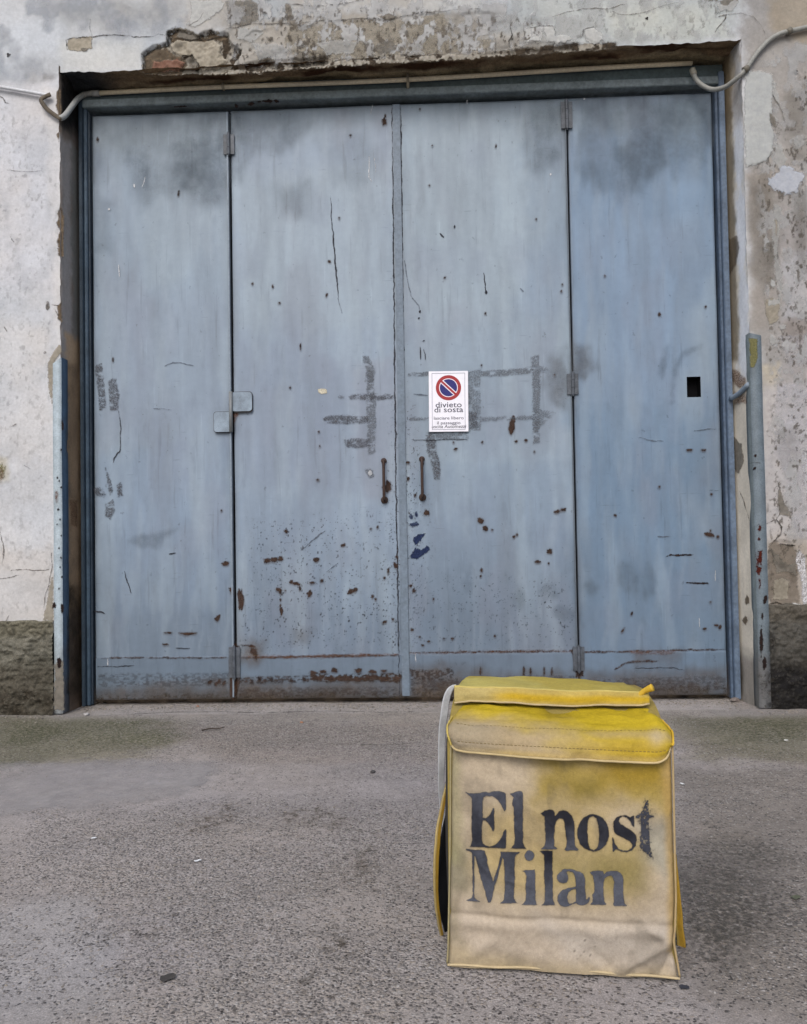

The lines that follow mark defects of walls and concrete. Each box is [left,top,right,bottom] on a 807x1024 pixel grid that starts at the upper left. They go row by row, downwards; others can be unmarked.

peeling [142,0,617,76]
peeling [762,185,807,250]
peeling [749,248,807,371]
corrosion [755,525,770,694]